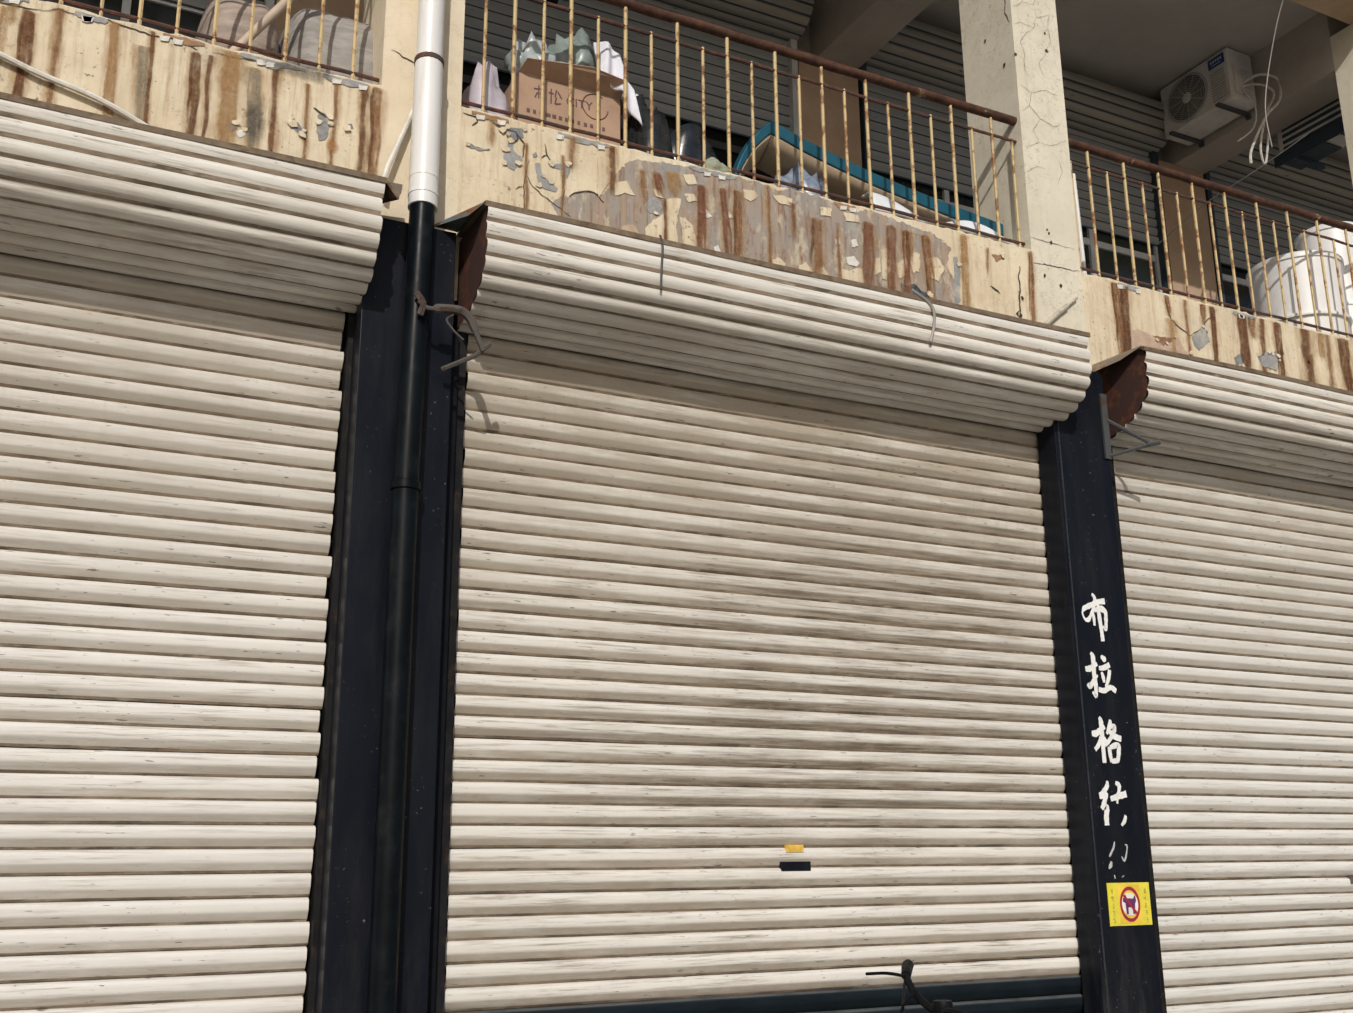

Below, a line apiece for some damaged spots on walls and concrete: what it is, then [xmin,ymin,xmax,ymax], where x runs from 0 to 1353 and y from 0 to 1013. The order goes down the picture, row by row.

rust [0,7,35,96]
rust [186,52,239,141]
rust [268,69,282,152]
rust [358,87,381,174]
crack [1004,1,1062,183]
peeling [466,111,962,304]
rust [697,184,742,255]
rust [863,221,936,298]
rust [1111,282,1131,353]
rust [1165,295,1218,361]
rust [1237,314,1285,376]
rust [1301,328,1353,391]